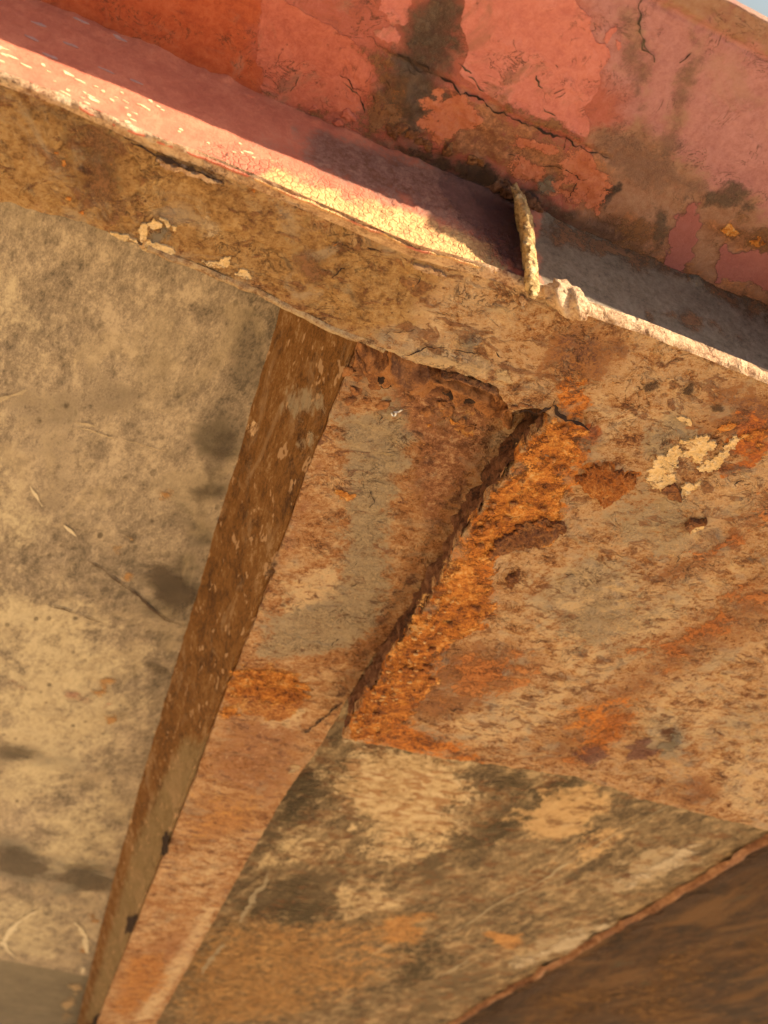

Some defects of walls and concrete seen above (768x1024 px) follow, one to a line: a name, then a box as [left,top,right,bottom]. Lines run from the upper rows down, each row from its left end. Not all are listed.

crack [340,36,608,202]
corrosion [156,157,222,184]
corrosion [346,49,768,323]
damp [706,181,753,211]
peeling [110,216,177,255]
peeling [201,256,252,280]
crack [516,401,591,432]
peeling [645,415,740,498]
corrosion [348,417,589,742]
corrosion [561,712,659,768]
damp [450,766,587,871]
damp [60,865,113,891]